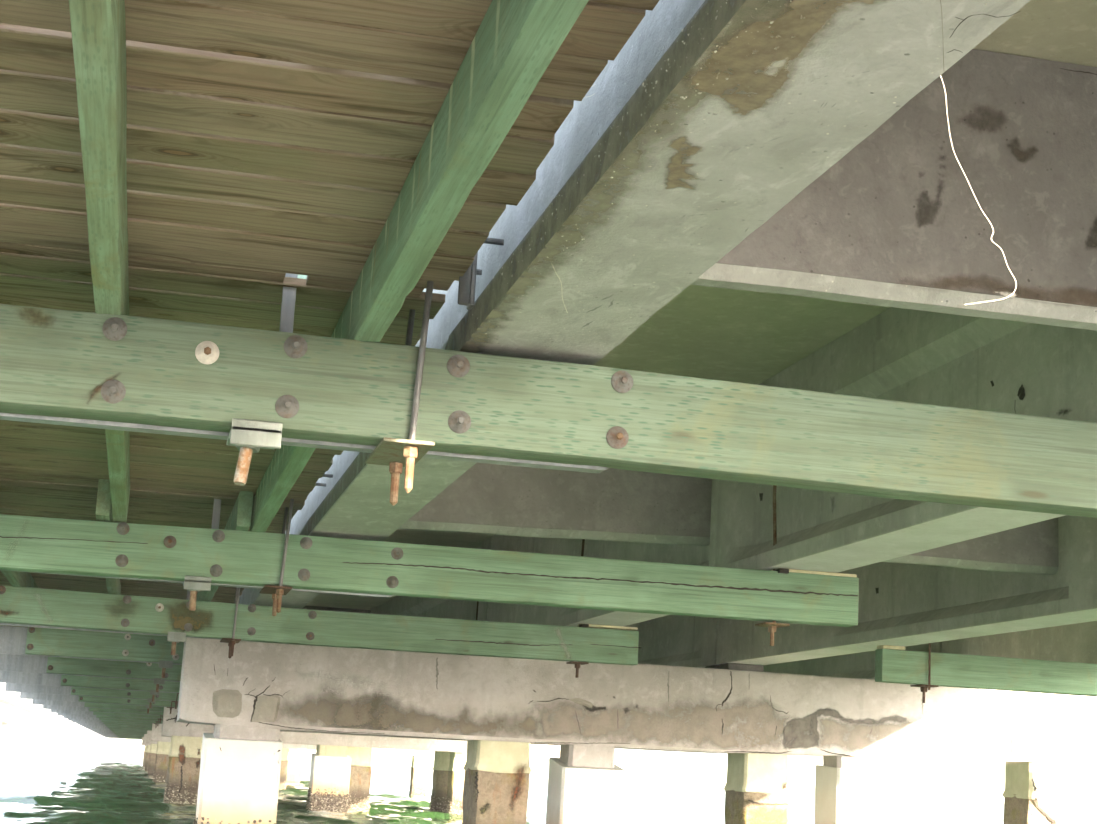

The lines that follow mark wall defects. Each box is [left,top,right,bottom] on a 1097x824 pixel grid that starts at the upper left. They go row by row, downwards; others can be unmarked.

damp [689,0,878,115]
damp [666,137,701,189]
damp [1008,139,1037,161]
damp [916,184,942,226]
damp [1086,219,1097,248]
corrosion [179,745,200,768]
crack [214,666,385,734]
damp [280,695,1097,757]
crack [716,671,791,754]
crack [820,722,880,759]
corrosion [510,766,524,809]
crack [1032,778,1056,824]